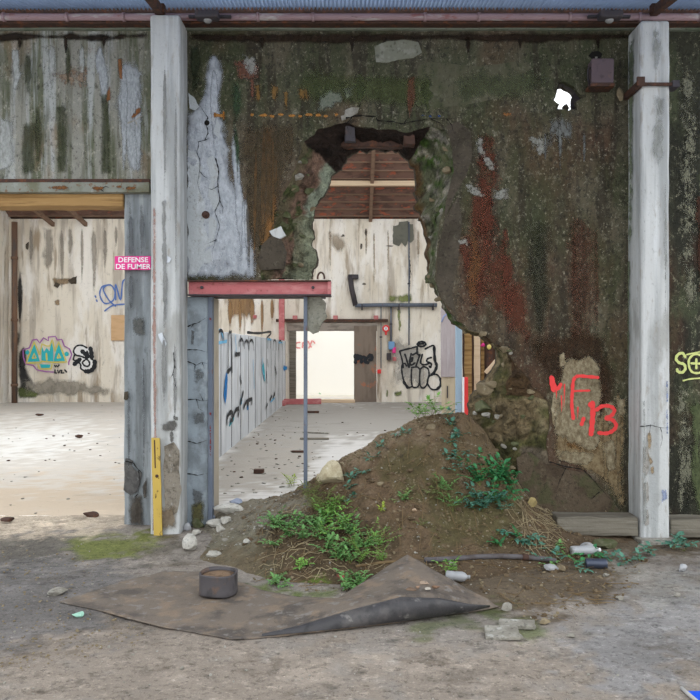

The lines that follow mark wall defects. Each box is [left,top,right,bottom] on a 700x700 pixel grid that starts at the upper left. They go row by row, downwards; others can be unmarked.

damp [0,32,146,173]
crack [197,106,223,255]
crack [171,349,207,410]
spalling [258,107,620,513]
spalling [124,458,142,495]
spalling [163,442,182,514]